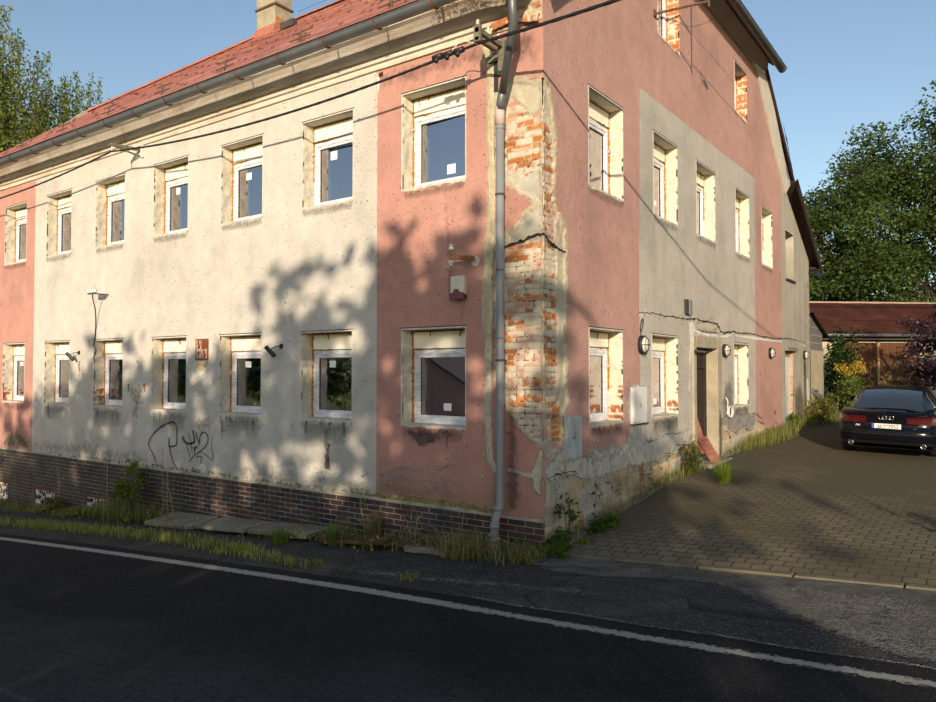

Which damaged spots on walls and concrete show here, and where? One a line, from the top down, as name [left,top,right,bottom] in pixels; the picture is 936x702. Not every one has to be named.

flaking render [491,75,571,463]
crack [639,312,803,343]
water stain [410,429,450,446]
flaking render [545,452,689,550]